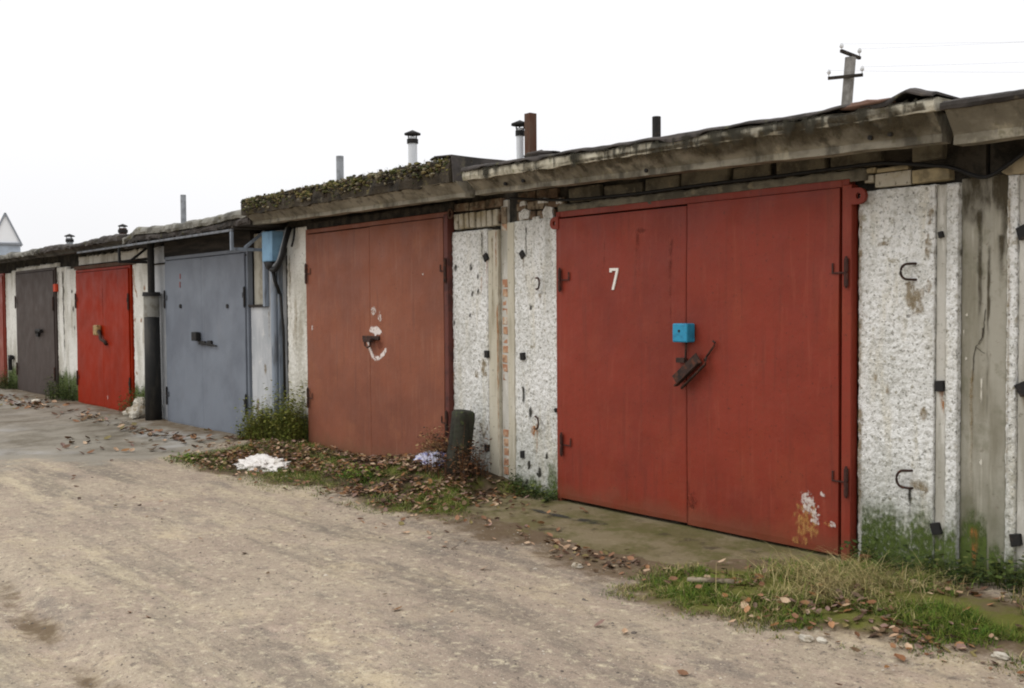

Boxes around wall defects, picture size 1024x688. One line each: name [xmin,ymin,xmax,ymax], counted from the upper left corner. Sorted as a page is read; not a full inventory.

damp [467,99,929,182]
damp [963,174,1008,325]
crack [972,309,986,382]
peeling [793,492,835,545]